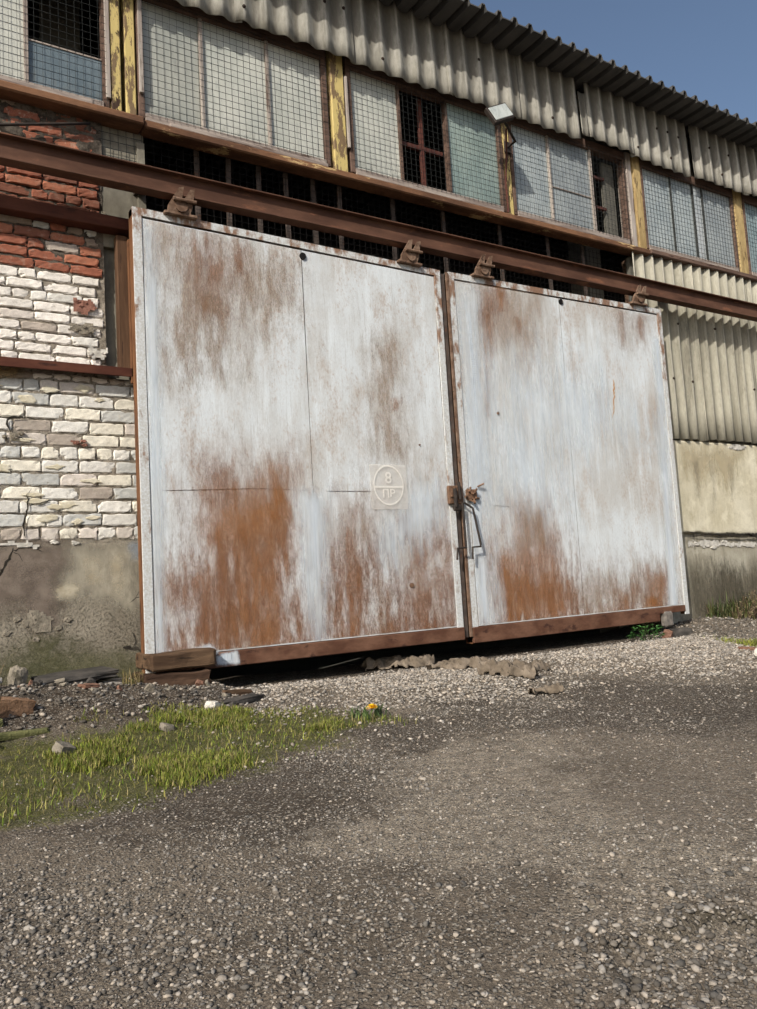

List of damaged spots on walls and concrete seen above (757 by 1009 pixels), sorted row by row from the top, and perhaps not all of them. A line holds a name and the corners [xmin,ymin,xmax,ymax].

spalling [68,297,97,334]
spalling [87,346,108,360]
peeling [18,386,60,403]
peeling [21,493,78,522]
crack [0,491,52,576]